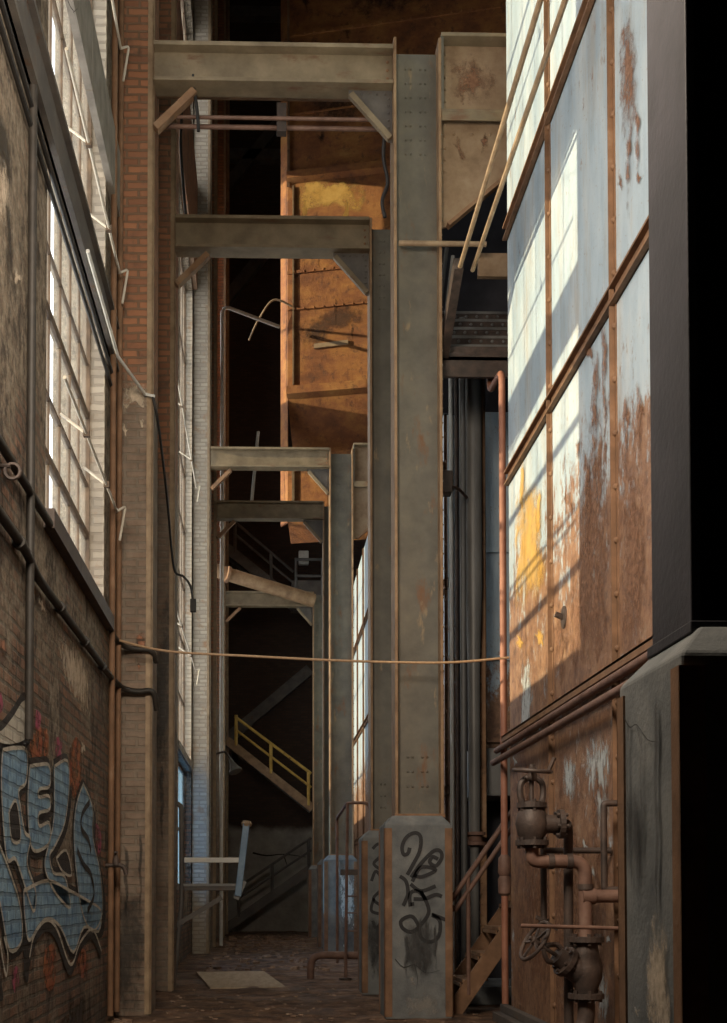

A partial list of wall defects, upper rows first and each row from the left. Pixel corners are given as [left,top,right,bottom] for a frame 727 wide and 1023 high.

rust [619,21,641,187]
rust [622,388,644,448]
rust [515,467,543,591]
rust [536,333,608,683]